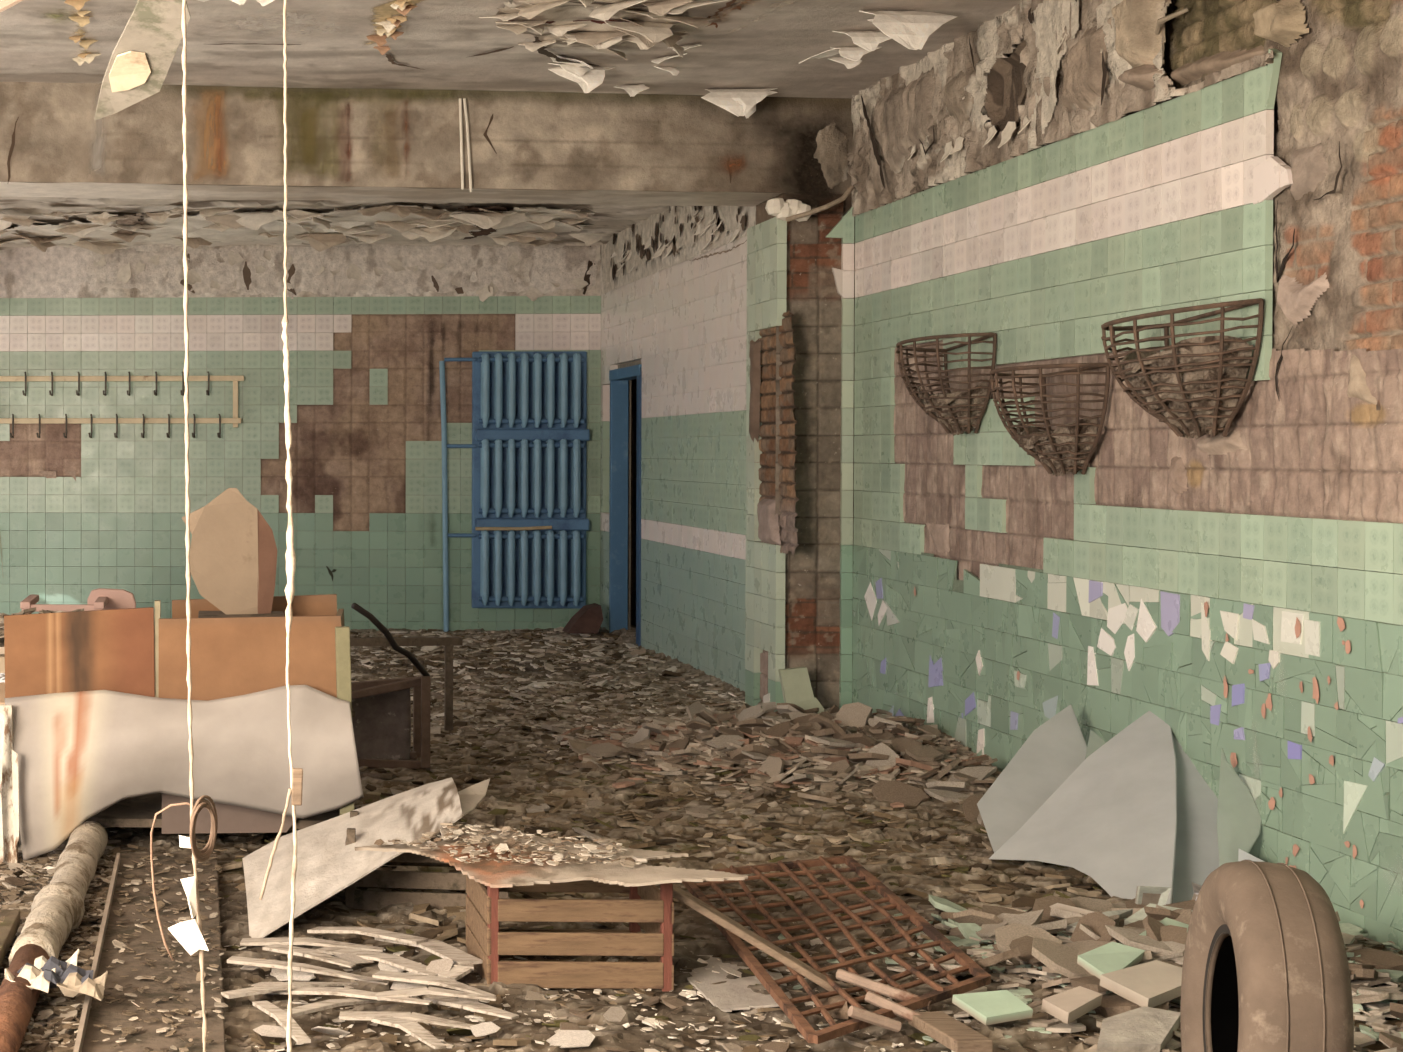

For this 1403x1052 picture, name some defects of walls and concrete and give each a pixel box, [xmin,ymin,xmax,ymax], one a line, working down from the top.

peeling [0,205,746,531]
peeling [479,0,728,97]
peeling [749,199,853,709]
peeling [888,0,1403,581]